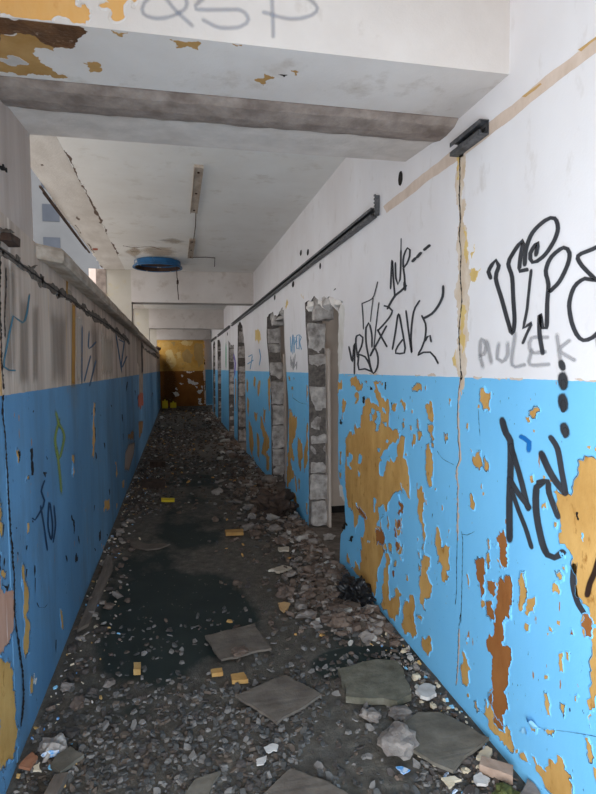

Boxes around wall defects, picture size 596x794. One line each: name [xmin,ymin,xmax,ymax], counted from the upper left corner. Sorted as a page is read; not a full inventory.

peeling [170,39,201,50]
peeling [254,70,298,84]
peeling [473,376,492,413]
crack [437,154,480,685]
peeling [525,405,541,432]
peeling [15,447,47,483]
peeling [165,288,451,658]
peeling [470,447,490,472]
peeling [469,483,484,512]
peeling [15,562,31,659]
peeling [530,446,596,781]
peeling [460,528,575,794]